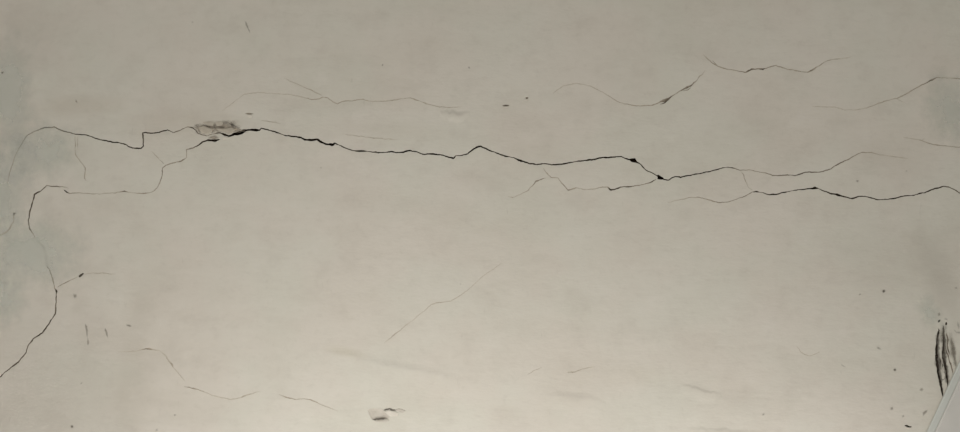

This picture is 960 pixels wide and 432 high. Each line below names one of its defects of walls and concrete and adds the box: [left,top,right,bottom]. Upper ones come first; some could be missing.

crack [555,55,849,106]
crack [813,77,960,110]
crack [0,120,960,377]